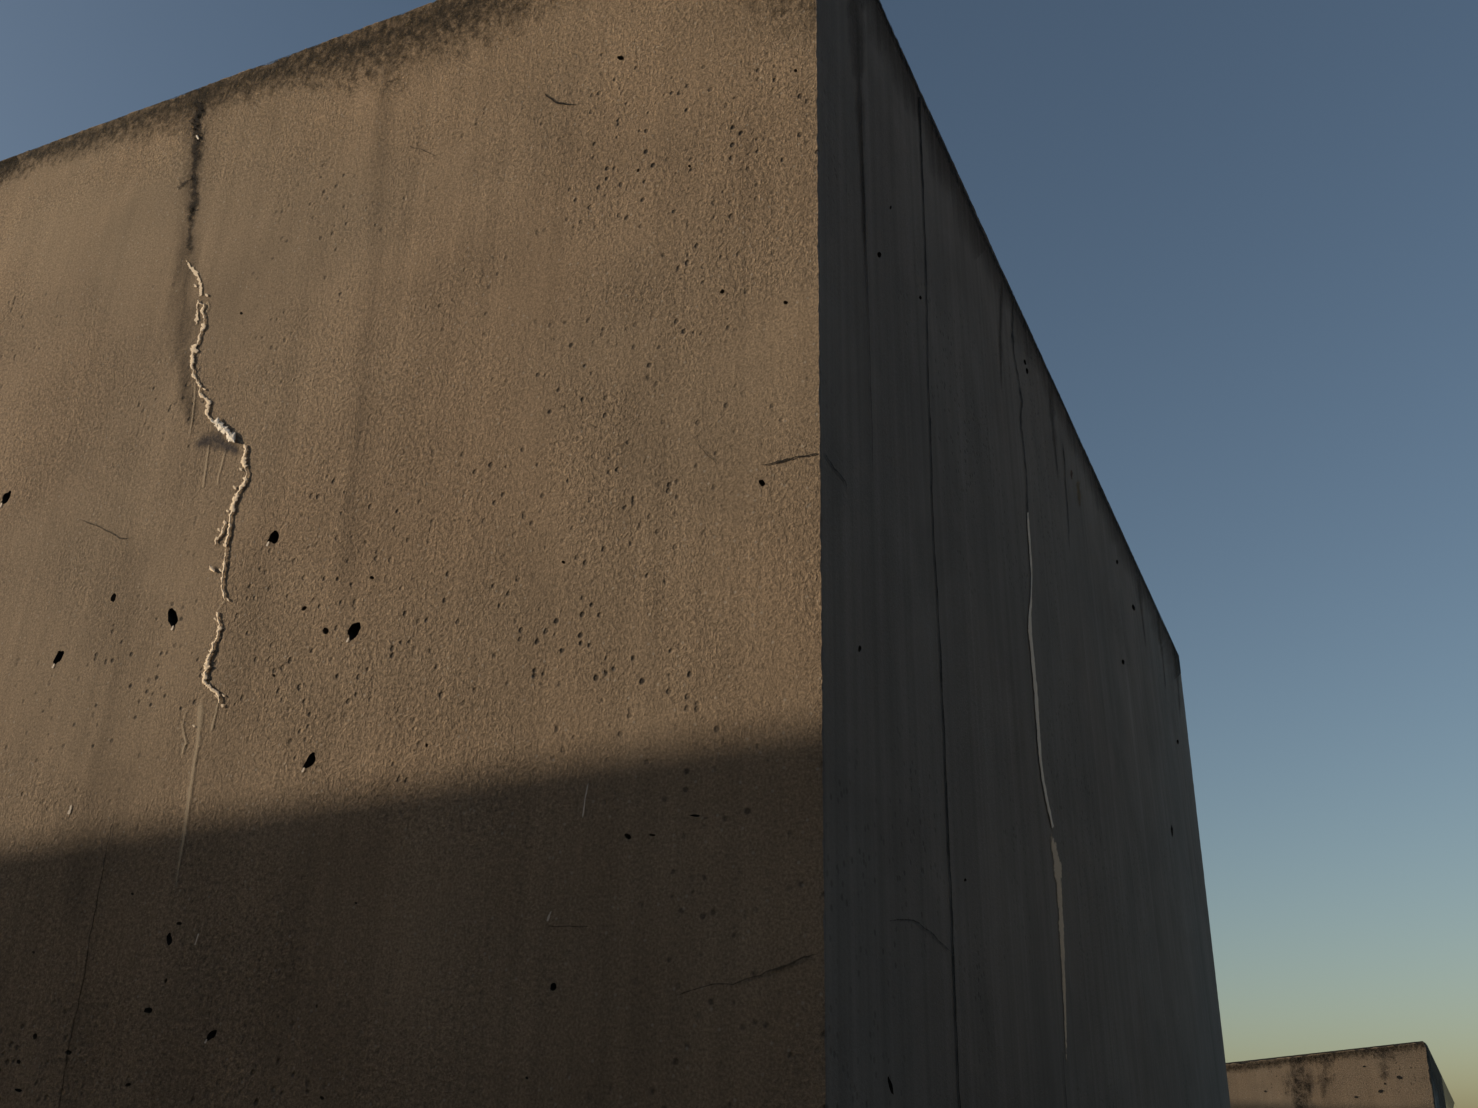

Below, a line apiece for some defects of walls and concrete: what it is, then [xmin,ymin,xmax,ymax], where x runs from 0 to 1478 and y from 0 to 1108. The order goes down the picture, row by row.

damp [176,705,217,883]
damp [189,386,237,485]
crack [186,261,248,727]
crack [1011,300,1067,1105]